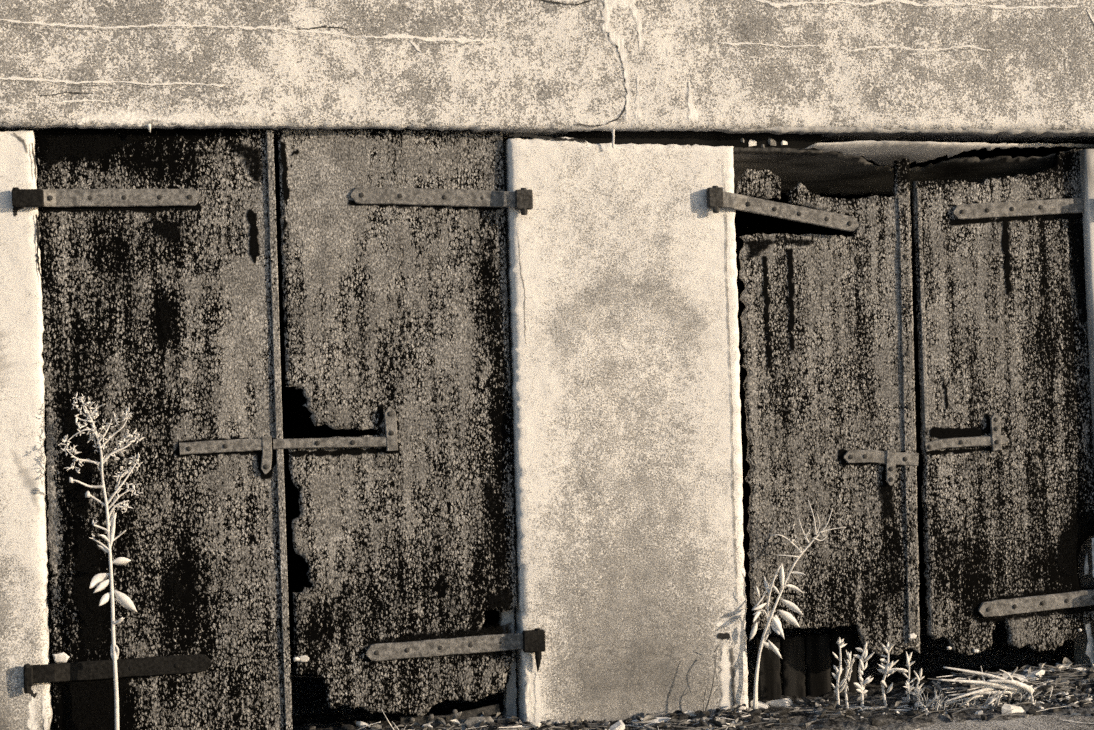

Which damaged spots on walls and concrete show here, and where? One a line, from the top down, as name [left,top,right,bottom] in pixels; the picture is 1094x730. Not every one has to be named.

crack [0,19,499,52]
crack [0,76,244,104]
corrosion [40,204,202,241]
corrosion [247,208,260,264]
corrosion [950,213,1087,324]
corrosion [745,237,815,368]
corrosion [61,400,95,519]
corrosion [174,436,277,479]
corrosion [900,413,1009,456]
corrosion [66,534,108,663]
corrosion [972,585,1094,624]
corrosion [60,674,170,730]